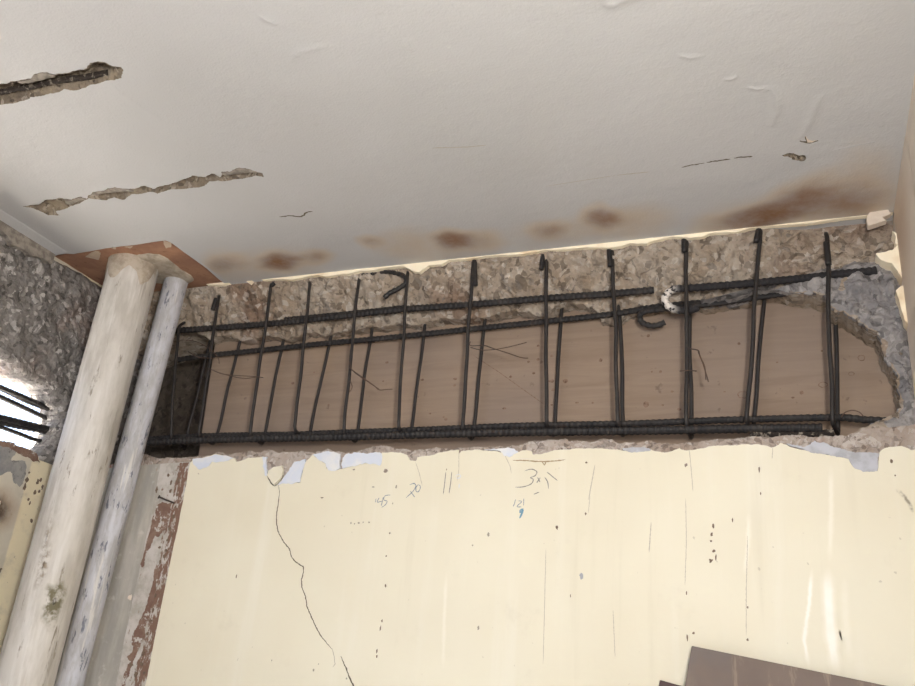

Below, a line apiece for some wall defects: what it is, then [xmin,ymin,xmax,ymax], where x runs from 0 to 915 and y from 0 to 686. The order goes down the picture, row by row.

flaking render [0,61,123,105]
flaking render [23,168,264,216]
rust [192,125,904,283]
flaking render [782,153,806,161]
spalling [0,210,915,686]
crack [267,476,354,686]